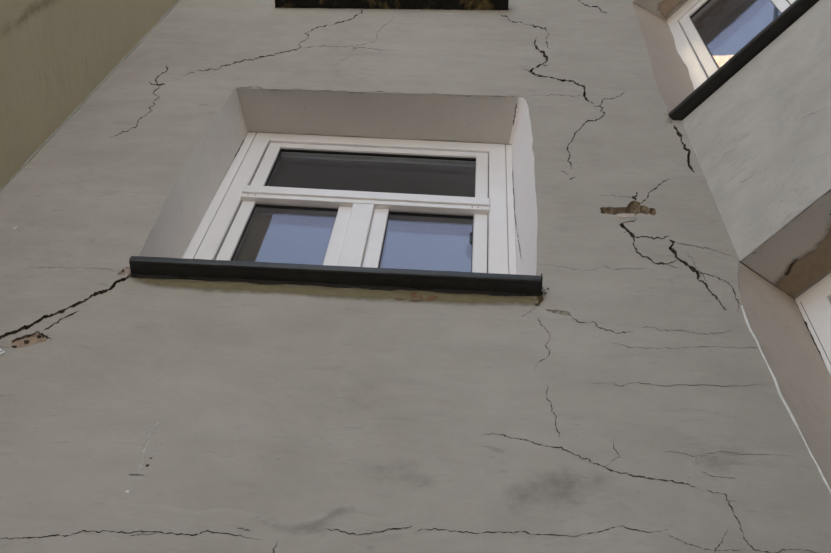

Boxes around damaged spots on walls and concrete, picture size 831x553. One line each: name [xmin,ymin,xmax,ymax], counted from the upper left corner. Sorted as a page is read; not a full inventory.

crack [188,9,391,74]
peeling [658,0,684,18]
crack [112,67,168,137]
crack [431,15,625,180]
crack [674,127,695,172]
spalling [600,201,656,224]
crack [601,179,668,203]
crack [544,189,831,312]
spalling [11,333,46,348]
crack [0,268,132,348]
crack [326,385,818,553]
crack [0,528,277,553]